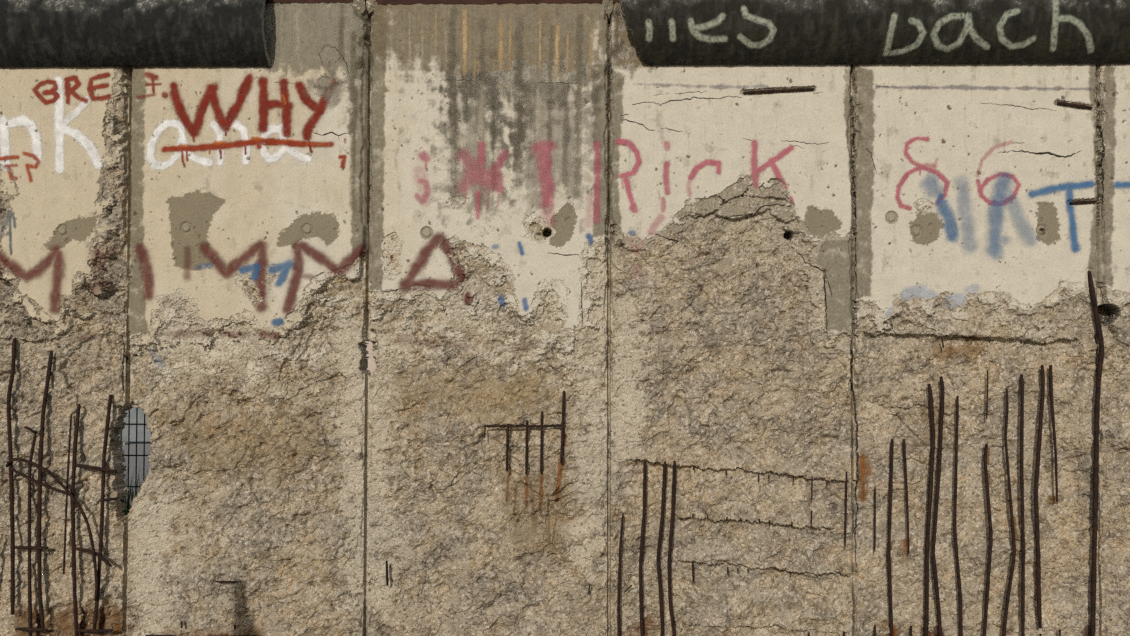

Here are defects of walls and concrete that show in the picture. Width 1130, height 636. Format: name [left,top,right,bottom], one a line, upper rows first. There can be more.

water stain [265,1,652,206]
spalling [740,85,816,96]
spalling [1035,64,1108,246]
rust [6,339,123,636]
spalling [0,66,372,636]
rust [617,461,676,636]
spalling [367,174,1099,636]
rust [844,376,963,636]
rust [983,444,993,636]
rust [1002,365,1058,636]
rust [1085,271,1104,636]
spalling [1093,280,1130,636]